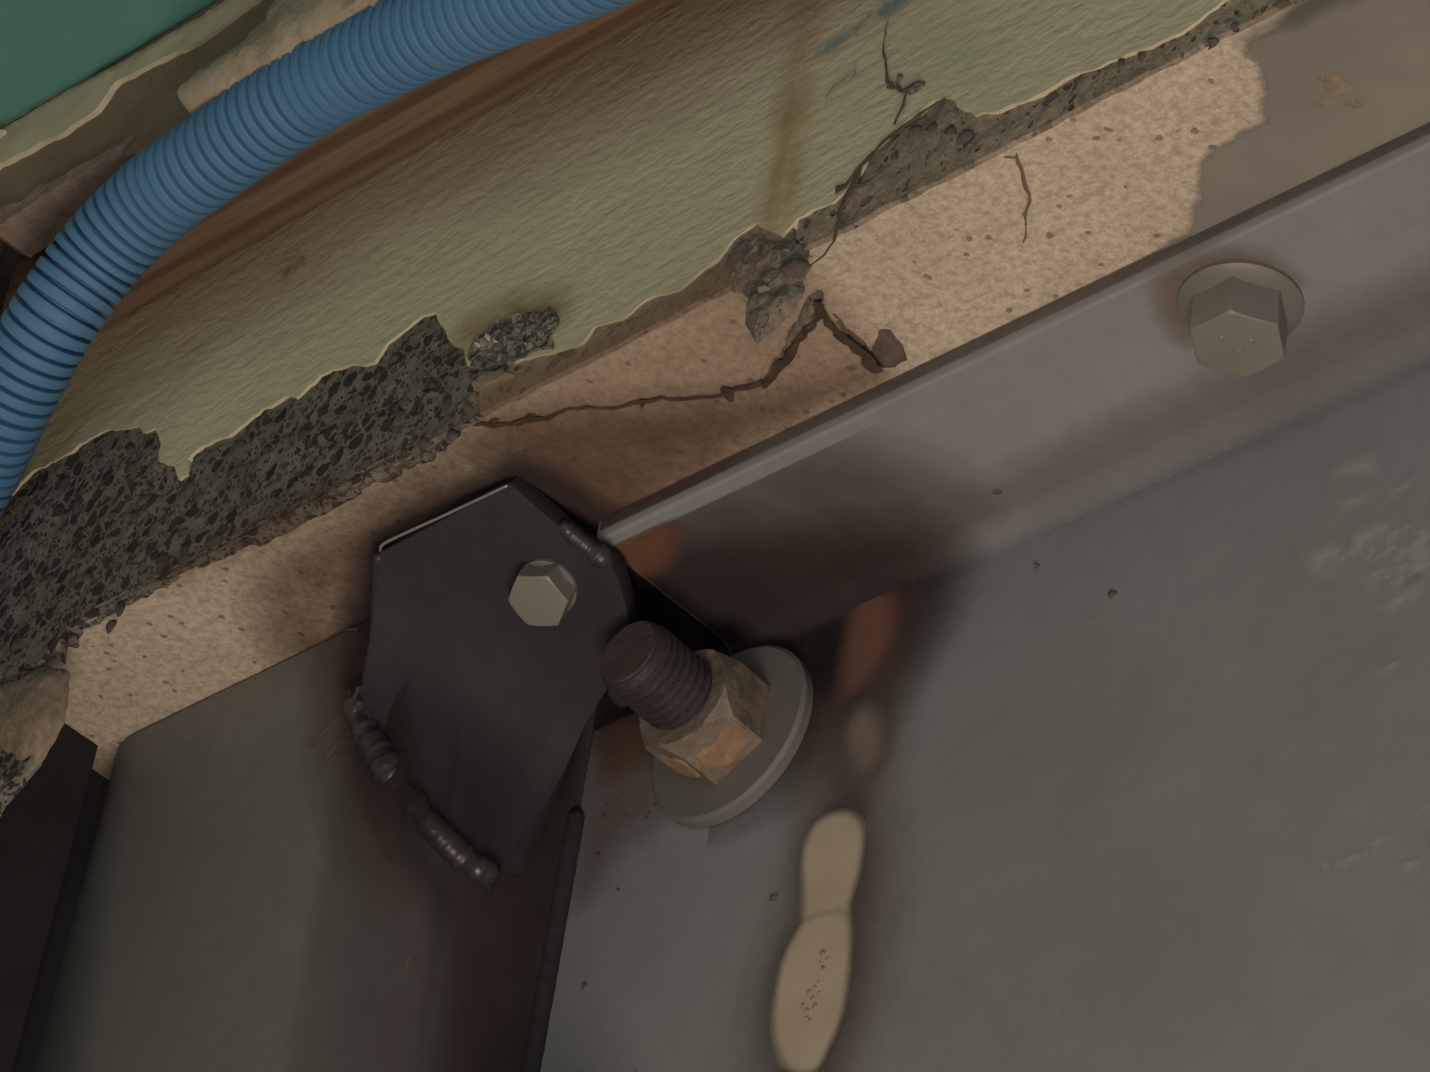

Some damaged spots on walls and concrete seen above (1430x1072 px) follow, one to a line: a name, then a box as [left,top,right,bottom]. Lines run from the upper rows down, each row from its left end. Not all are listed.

crack [811,20,946,266]
crack [1004,155,1032,243]
water stain [1159,0,1430,252]
spalling [0,0,1301,679]
crack [473,302,884,428]
corrosion [656,727,750,778]
spalling [0,723,109,1072]